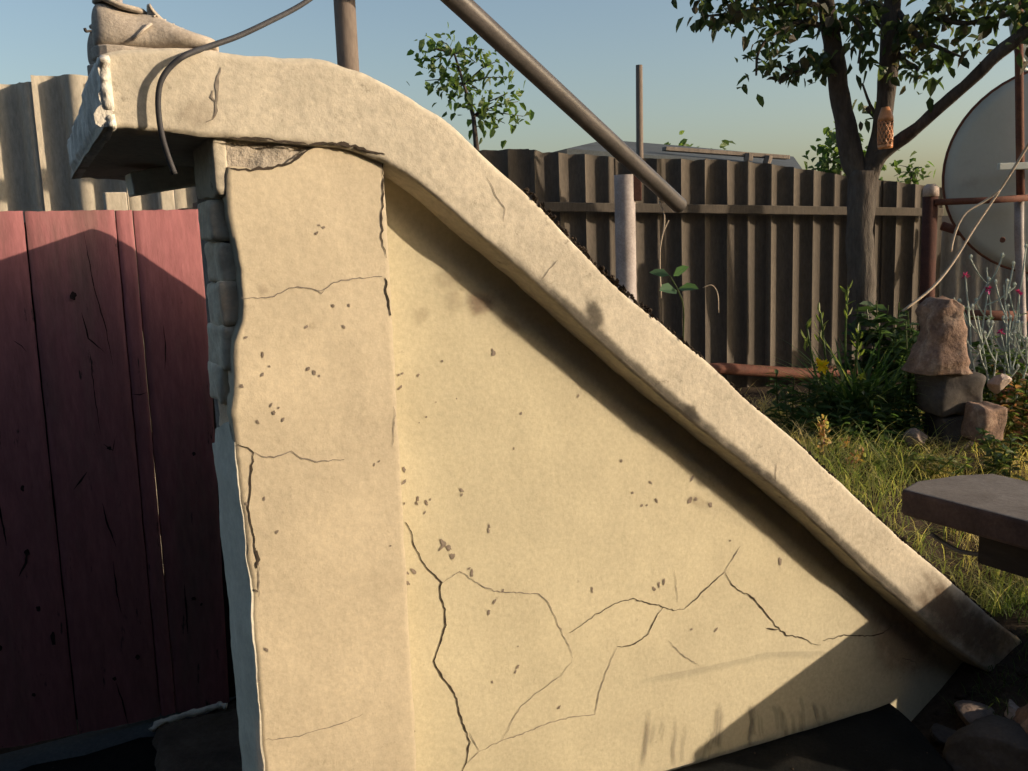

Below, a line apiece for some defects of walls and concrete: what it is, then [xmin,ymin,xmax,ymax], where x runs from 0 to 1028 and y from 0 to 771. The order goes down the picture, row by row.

crack [206,67,391,315]
crack [237,444,344,597]
crack [405,522,892,771]